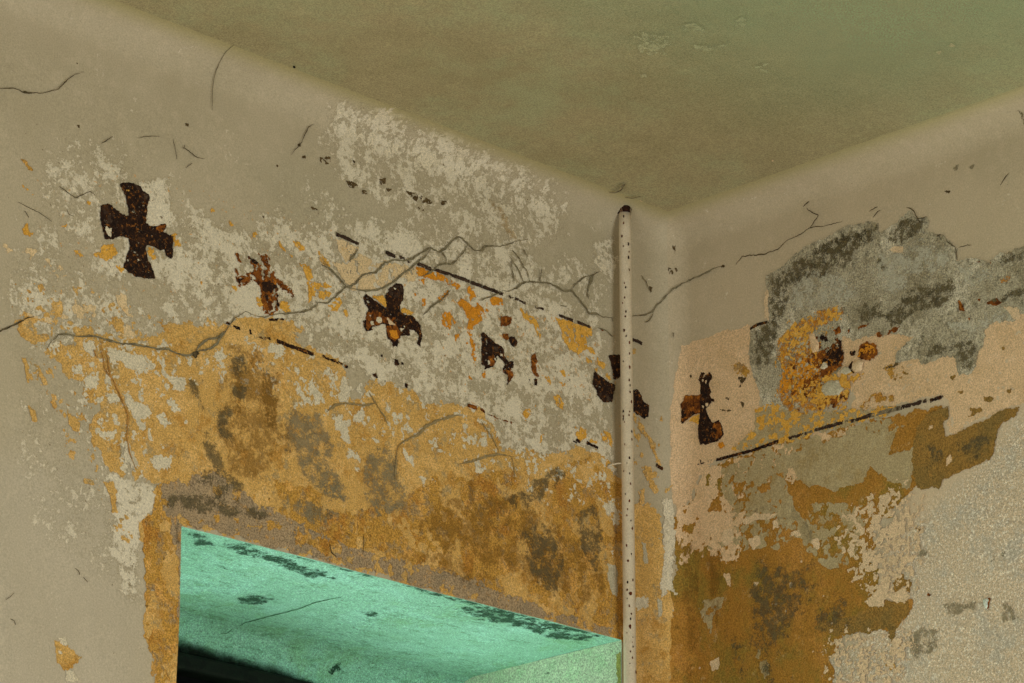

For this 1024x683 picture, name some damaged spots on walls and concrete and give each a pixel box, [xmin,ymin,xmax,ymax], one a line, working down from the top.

crack [0,74,75,94]
peeling [330,100,555,247]
damp [167,407,268,520]
rust [366,311,400,341]
crack [47,201,842,478]
rust [488,354,514,381]
peeling [3,209,1024,683]
rust [681,394,700,421]
rust [774,305,900,420]
damp [755,218,922,369]
damp [187,533,369,579]
damp [404,585,599,641]